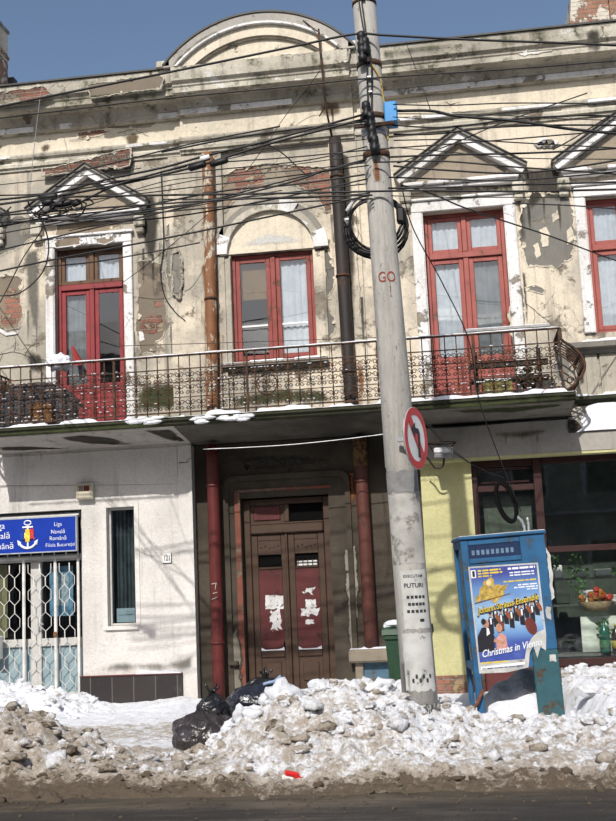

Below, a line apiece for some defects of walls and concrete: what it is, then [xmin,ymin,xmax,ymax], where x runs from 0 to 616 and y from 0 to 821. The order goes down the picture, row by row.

spalling [0,84,51,105]
spalling [77,122,159,140]
spalling [41,148,132,177]
peeling [222,161,331,214]
peeling [0,215,36,258]
peeling [518,192,577,271]
peeling [0,272,25,336]
peeling [132,222,173,371]